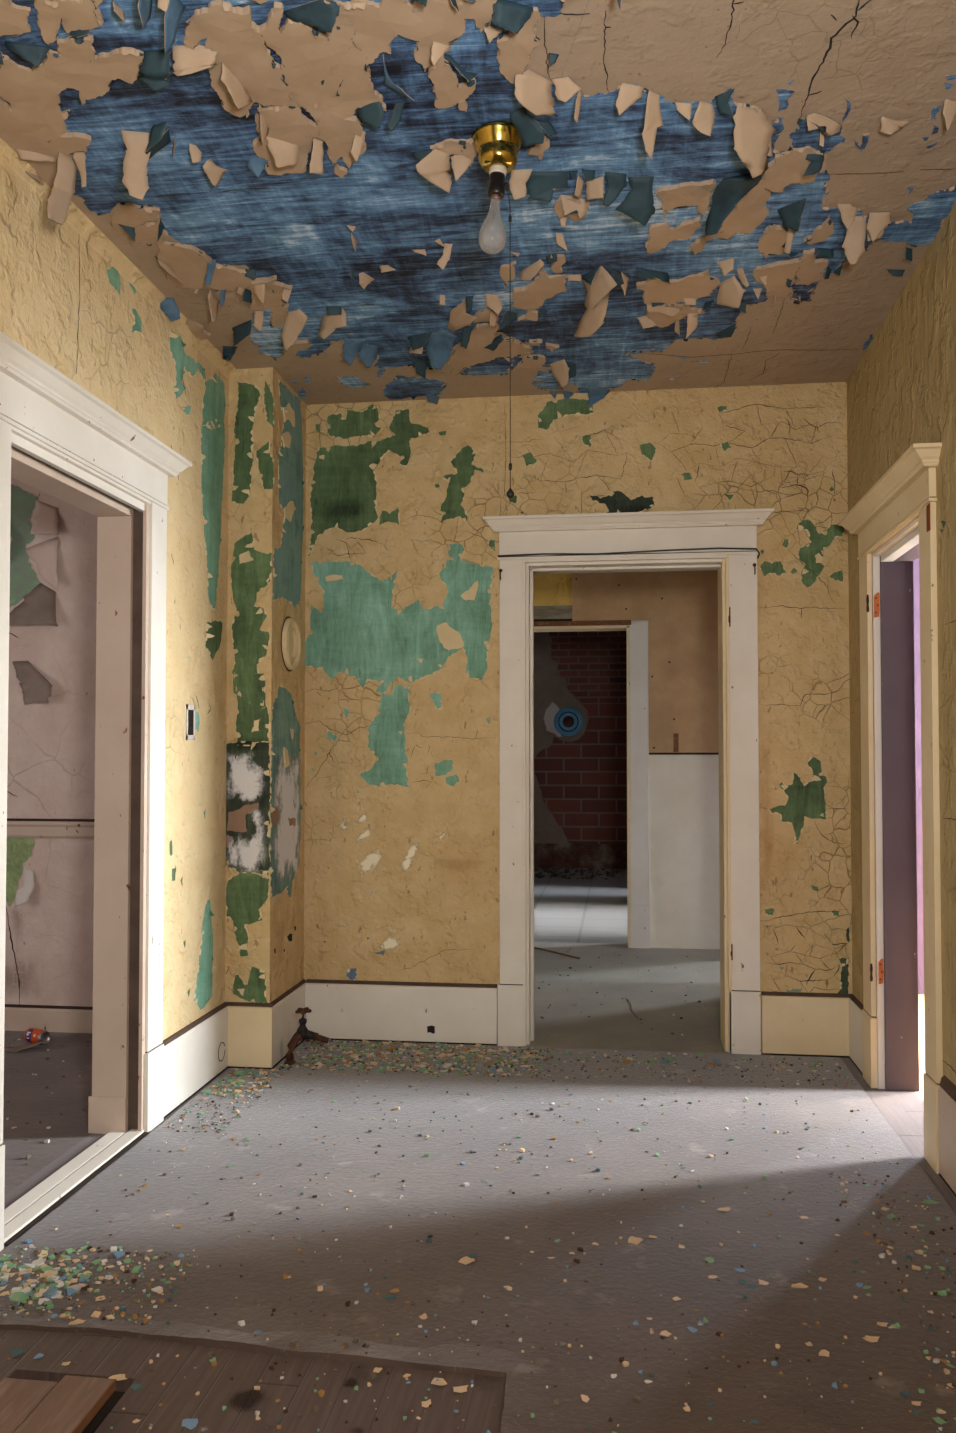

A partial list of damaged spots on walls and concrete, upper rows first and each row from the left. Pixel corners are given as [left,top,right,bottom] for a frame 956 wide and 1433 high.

crack [717,0,743,57]
crack [799,0,871,119]
crack [327,299,851,558]
peeling [0,0,956,1010]
crack [763,549,843,616]
crack [6,908,20,1005]
crack [769,908,849,993]